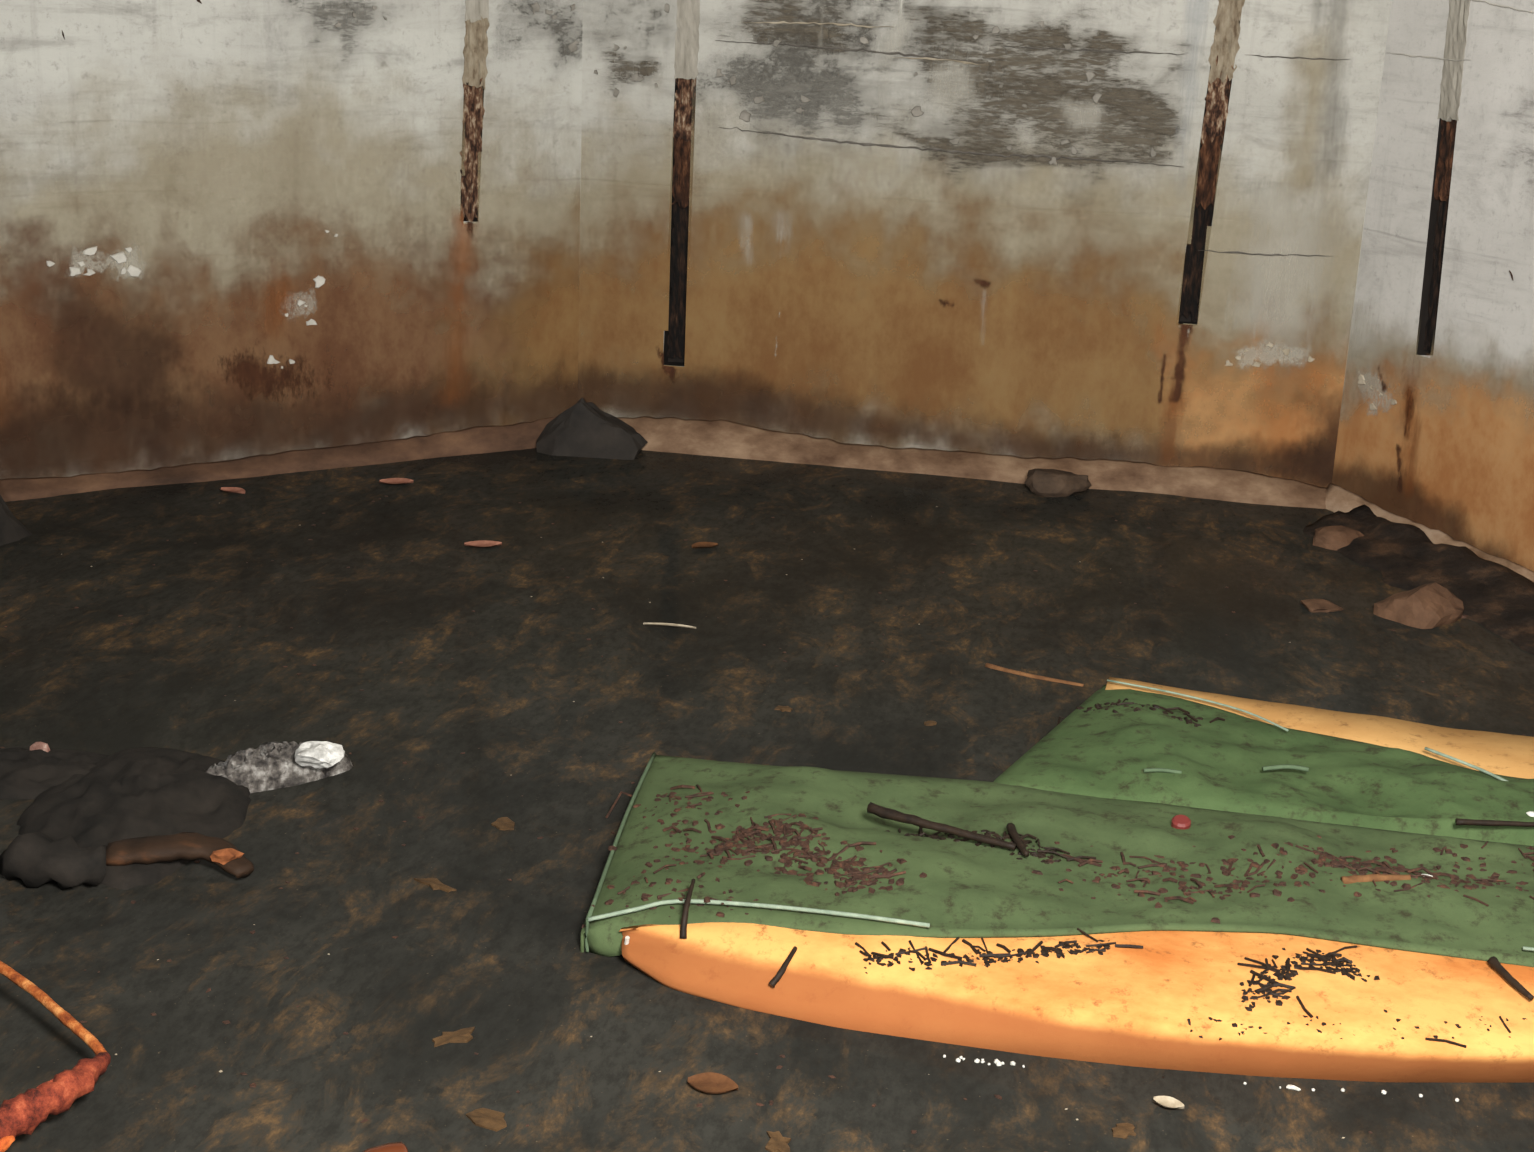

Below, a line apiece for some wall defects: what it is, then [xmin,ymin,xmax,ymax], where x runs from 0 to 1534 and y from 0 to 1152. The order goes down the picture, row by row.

rust [460,78,485,243]
rust [672,77,697,208]
rust [1193,55,1234,210]
rust [1434,119,1457,201]
leakage [0,120,1534,572]
rust [1158,324,1193,402]